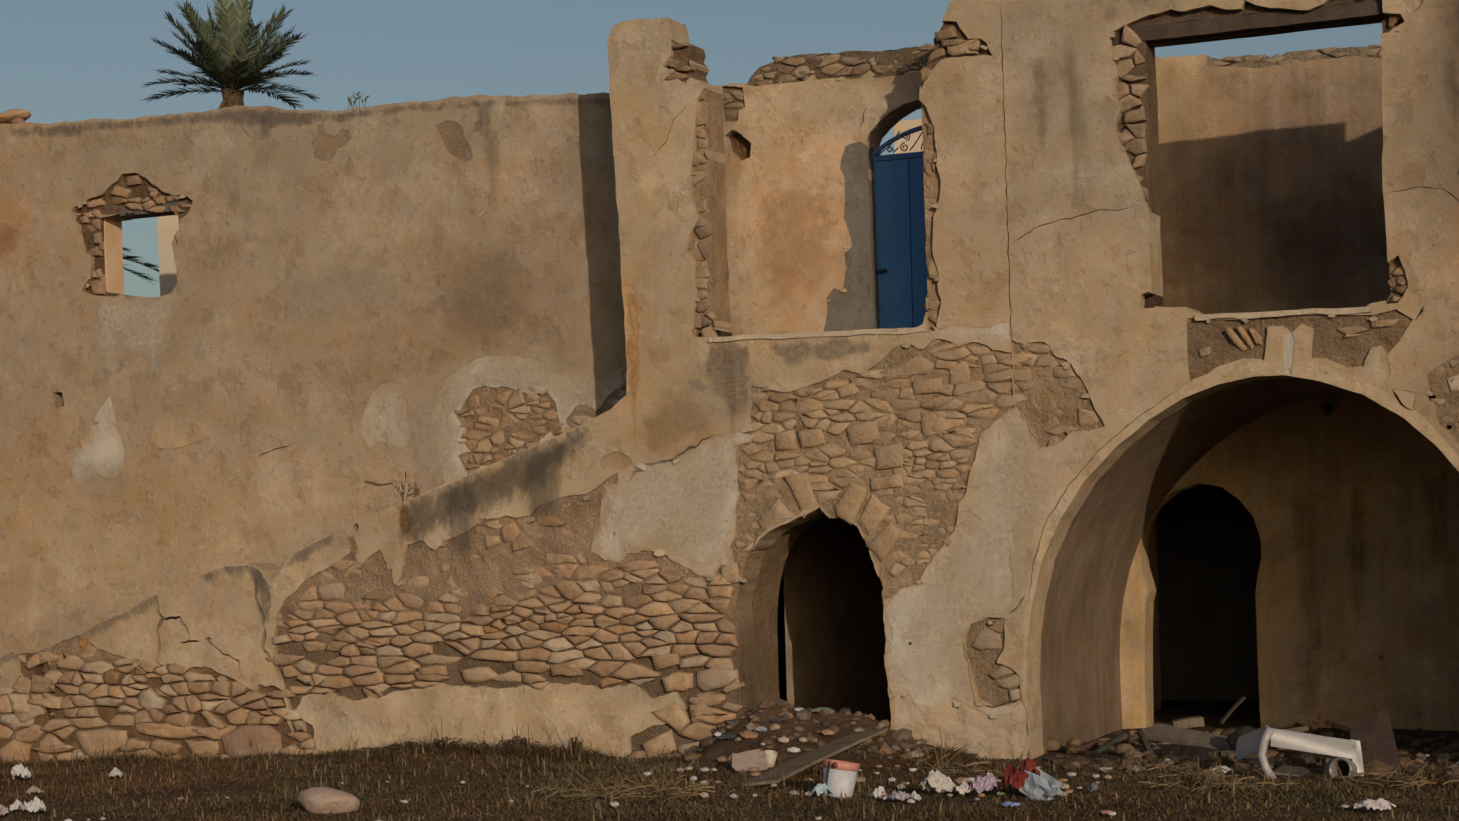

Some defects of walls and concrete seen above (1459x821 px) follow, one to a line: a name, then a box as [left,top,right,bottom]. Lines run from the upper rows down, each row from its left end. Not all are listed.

crack [1002,51,1127,342]
spalling [1112,24,1160,216]
spalling [1202,14,1405,69]
spalling [0,22,1105,765]
spalling [1187,256,1413,381]
spalling [1383,357,1459,443]